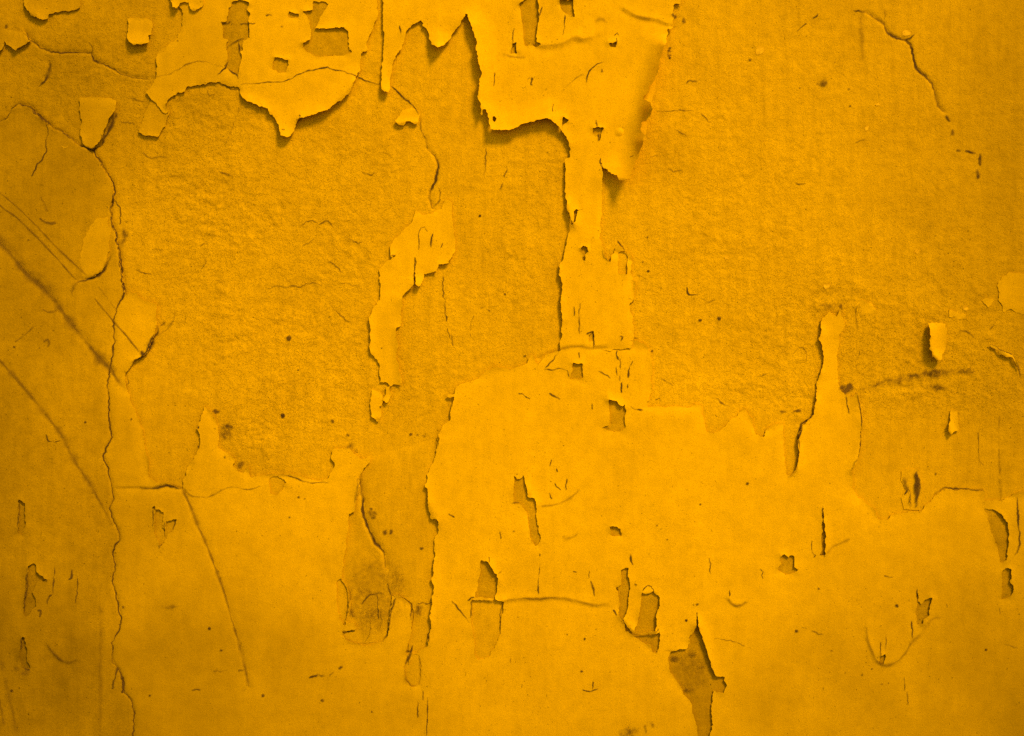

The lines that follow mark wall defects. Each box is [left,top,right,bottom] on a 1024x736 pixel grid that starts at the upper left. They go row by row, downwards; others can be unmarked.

peeling [127,17,153,45]
peeling [139,0,378,137]
crack [856,10,981,178]
peeling [381,0,681,351]
crack [1,35,163,736]
peeling [369,199,456,422]
peeling [928,310,966,360]
spalling [342,438,439,652]
spalling [471,598,504,659]
spalling [616,568,630,619]
spalling [634,591,660,634]
spalling [668,628,727,736]